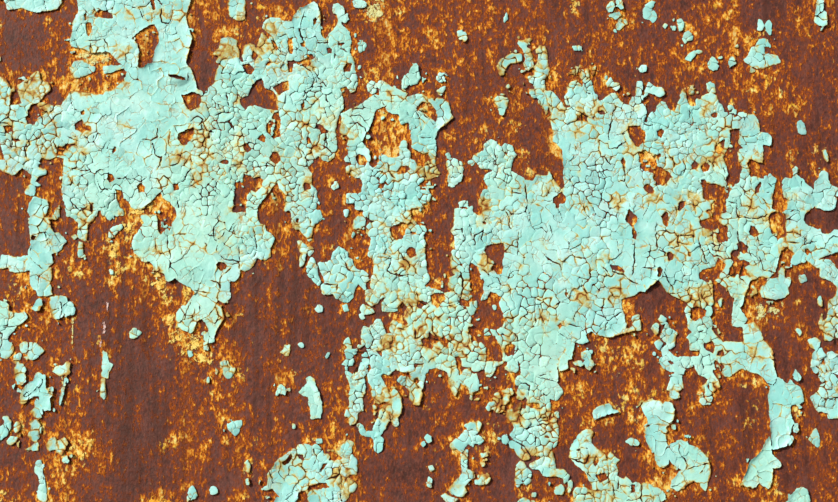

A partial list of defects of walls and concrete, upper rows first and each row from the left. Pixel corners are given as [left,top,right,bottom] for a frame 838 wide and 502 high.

rust [366,0,385,22]
crack [145,128,191,200]
peeling [0,0,358,351]
rust [150,272,172,304]
rust [164,314,214,365]
crack [504,185,552,248]
peeling [297,36,838,502]
crack [648,230,679,256]
rust [756,304,780,323]
peeling [0,299,73,463]
peeling [273,376,322,419]
peeling [244,434,358,502]